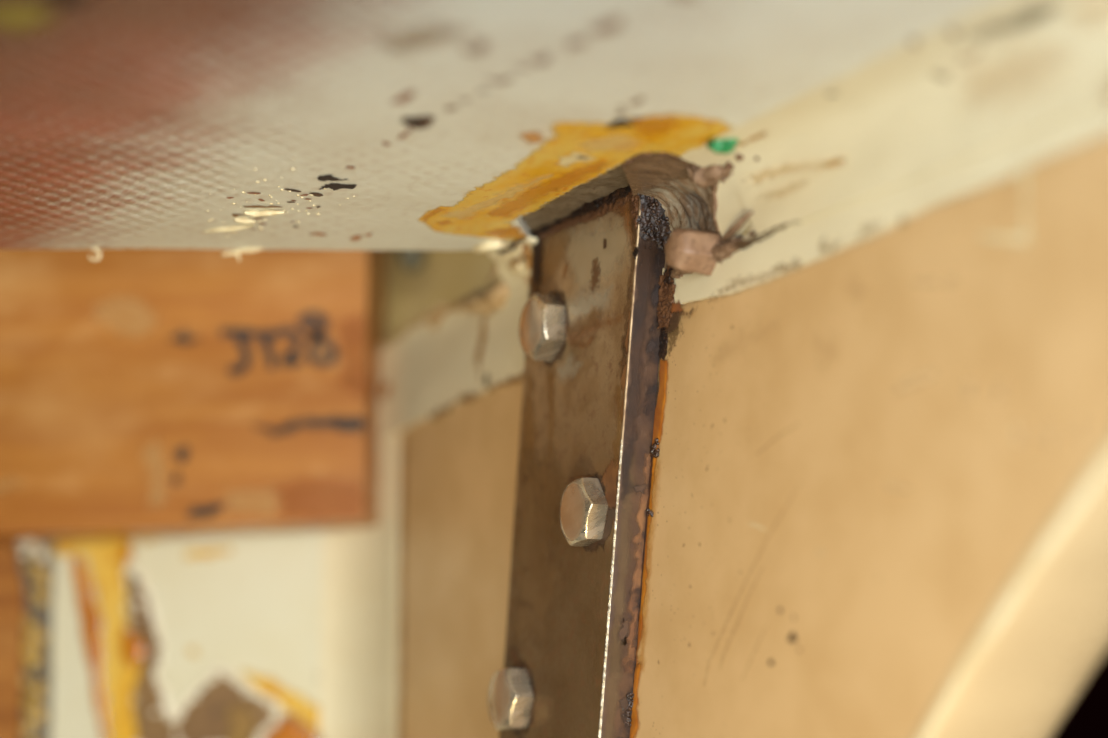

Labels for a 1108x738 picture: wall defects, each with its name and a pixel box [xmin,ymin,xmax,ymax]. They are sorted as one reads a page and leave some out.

spalling [382,116,435,146]
spalling [604,98,644,129]
spalling [473,238,532,283]
peeling [719,211,754,242]
corrosion [430,372,538,472]
corrosion [528,185,694,738]
peeling [126,561,279,738]
corrosion [509,649,536,736]